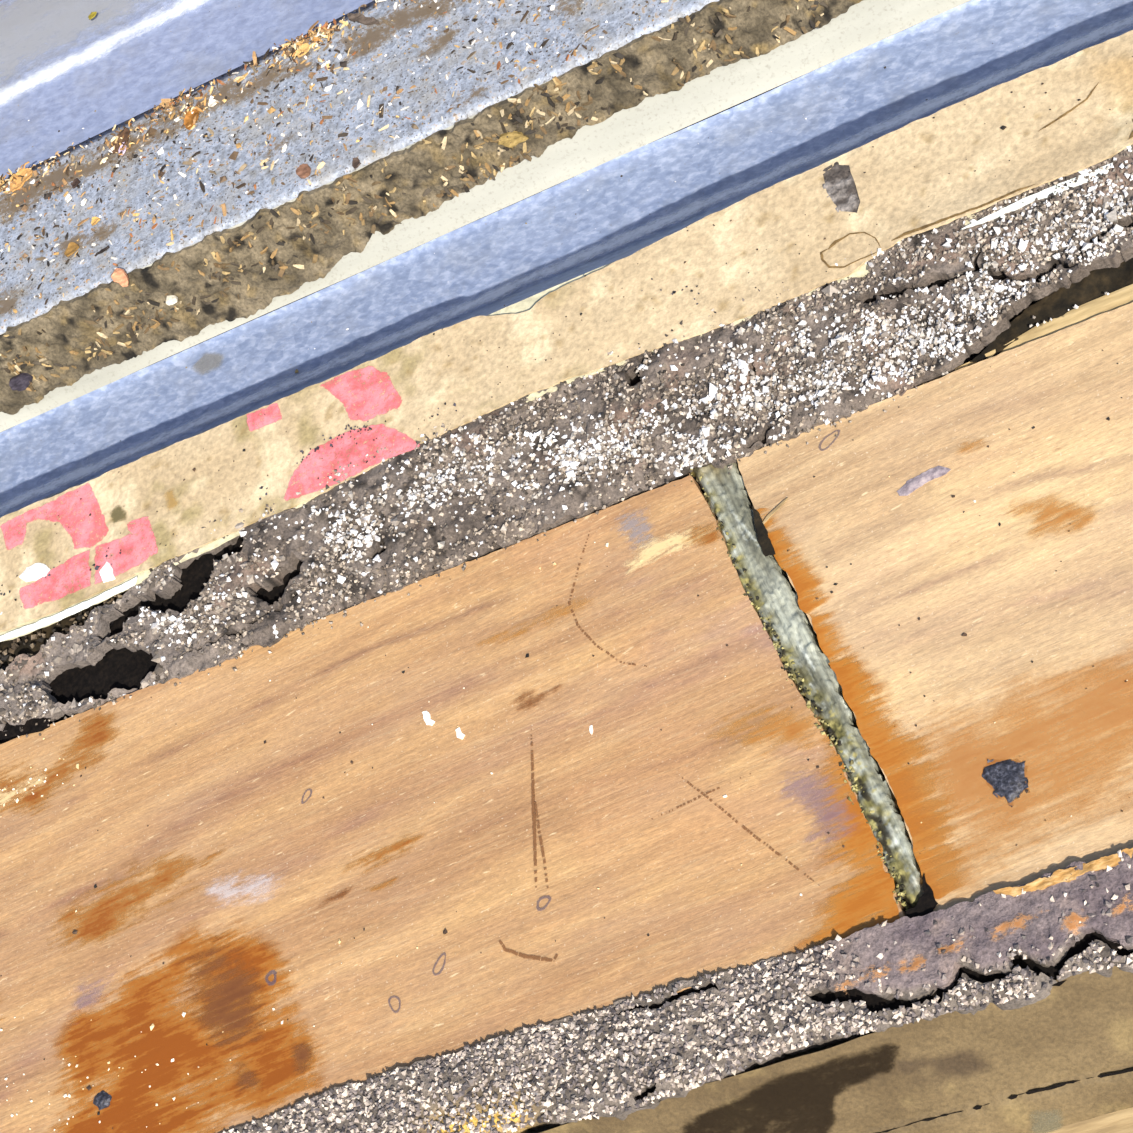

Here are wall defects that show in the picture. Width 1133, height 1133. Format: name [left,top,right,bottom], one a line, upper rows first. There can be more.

crack [1039,82,1099,131]
crack [864,264,1065,304]
water stain [53,931,320,1133]